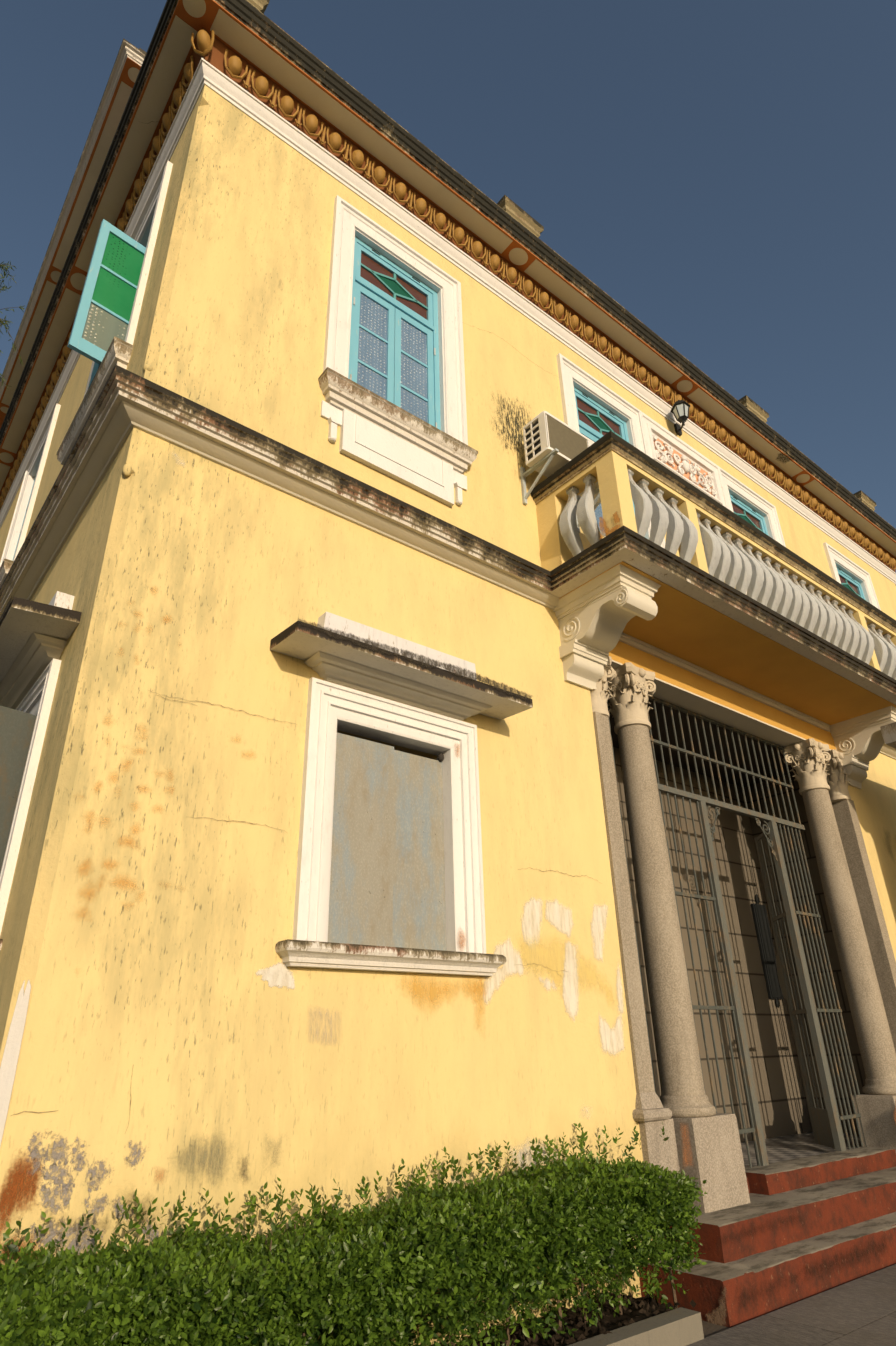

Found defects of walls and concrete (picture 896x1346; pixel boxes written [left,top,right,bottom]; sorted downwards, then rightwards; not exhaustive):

leakage [496,400,529,461]
peeling [483,898,578,1020]
peeling [591,905,607,959]
peeling [600,967,624,1055]
rust [0,1159,38,1231]
spalling [26,1132,159,1255]